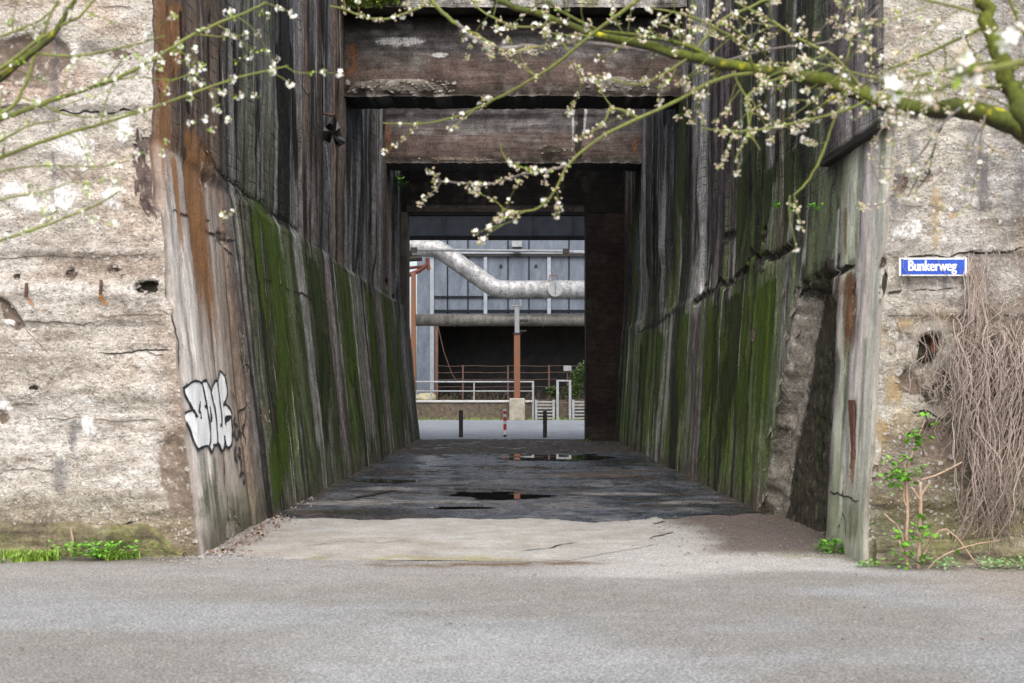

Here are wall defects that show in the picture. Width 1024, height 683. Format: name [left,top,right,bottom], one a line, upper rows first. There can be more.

crack [1,103,132,114]
corrosion [149,0,216,346]
crack [17,289,179,363]
spalling [136,281,158,294]
water stain [246,197,405,473]
water stain [630,64,784,460]
corrosion [836,268,856,367]
spalling [890,318,957,465]
crack [830,481,924,546]